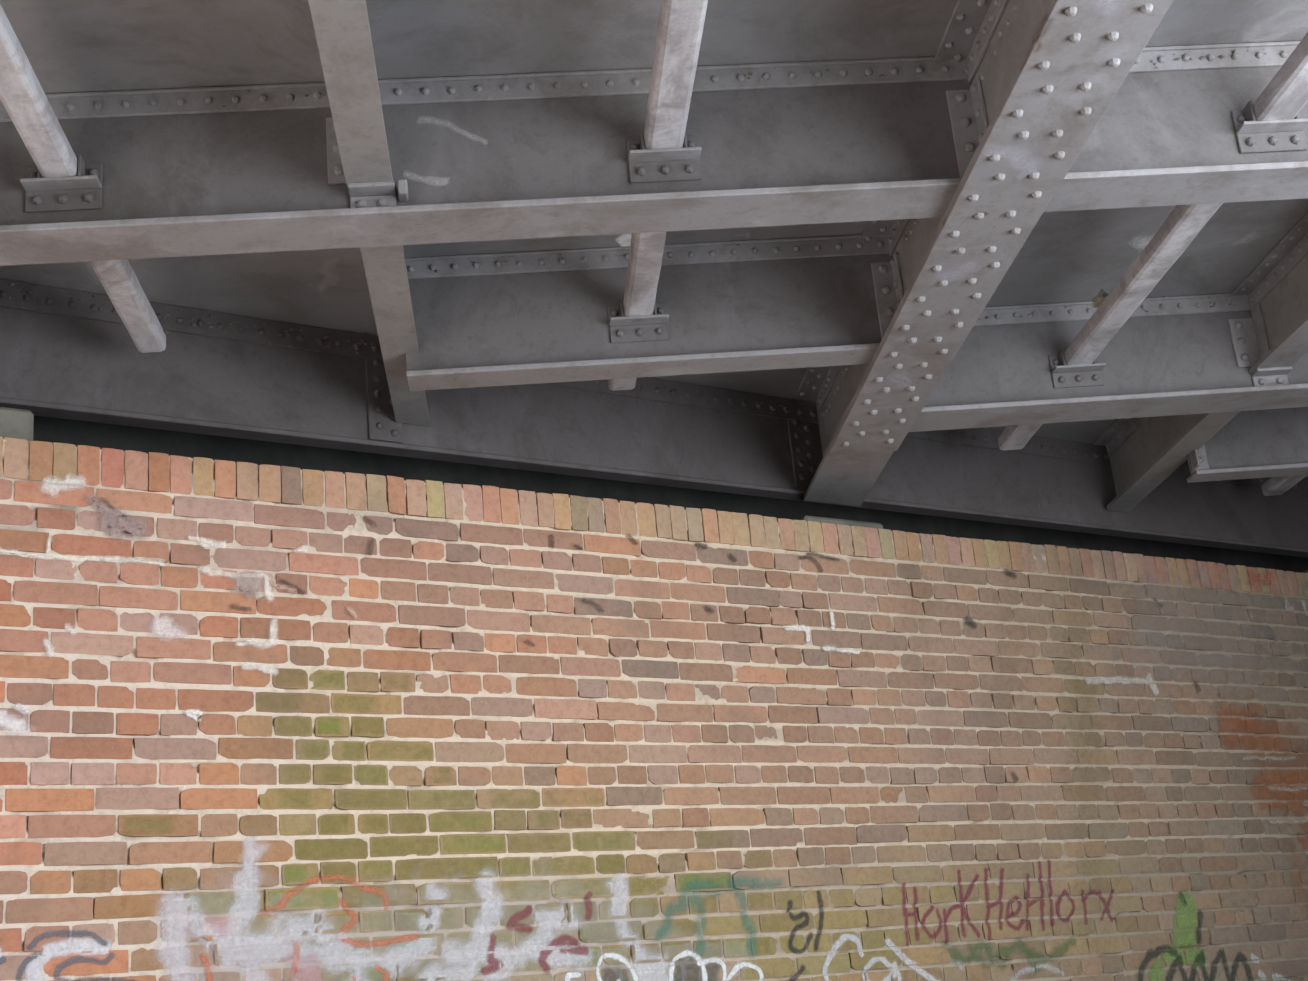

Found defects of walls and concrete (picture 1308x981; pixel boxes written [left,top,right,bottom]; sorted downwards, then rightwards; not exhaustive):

leakage [43,476,84,493]
leakage [153,618,184,637]